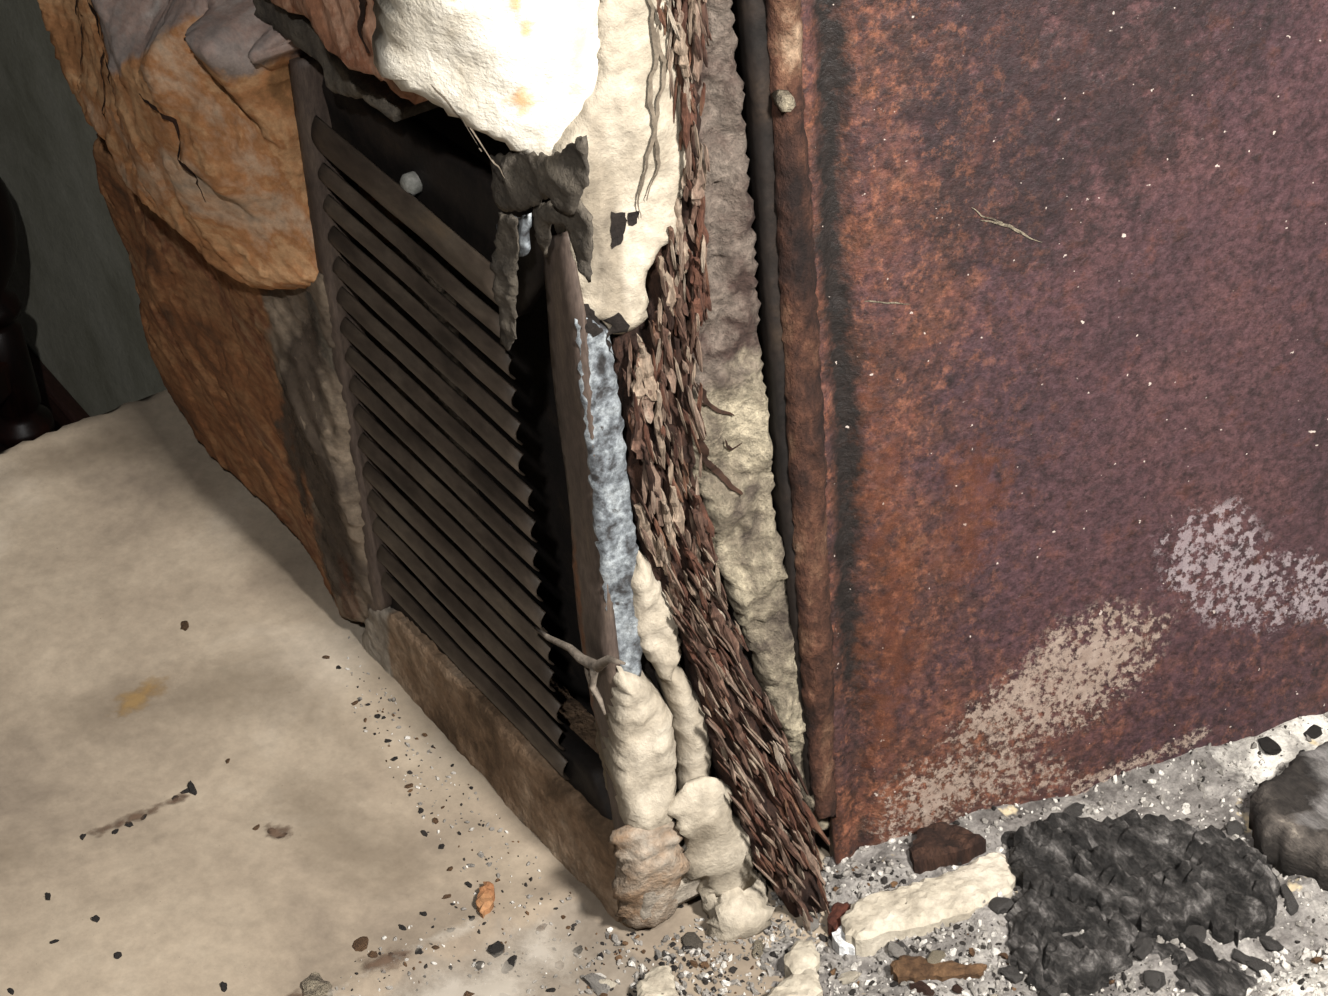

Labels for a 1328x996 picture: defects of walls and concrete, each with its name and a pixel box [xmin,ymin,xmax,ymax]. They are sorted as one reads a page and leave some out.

flaking render [489,135,594,351]
spalling [610,211,639,249]
spalling [581,304,630,403]
leakage [875,603,1208,840]
spalling [476,881,495,919]